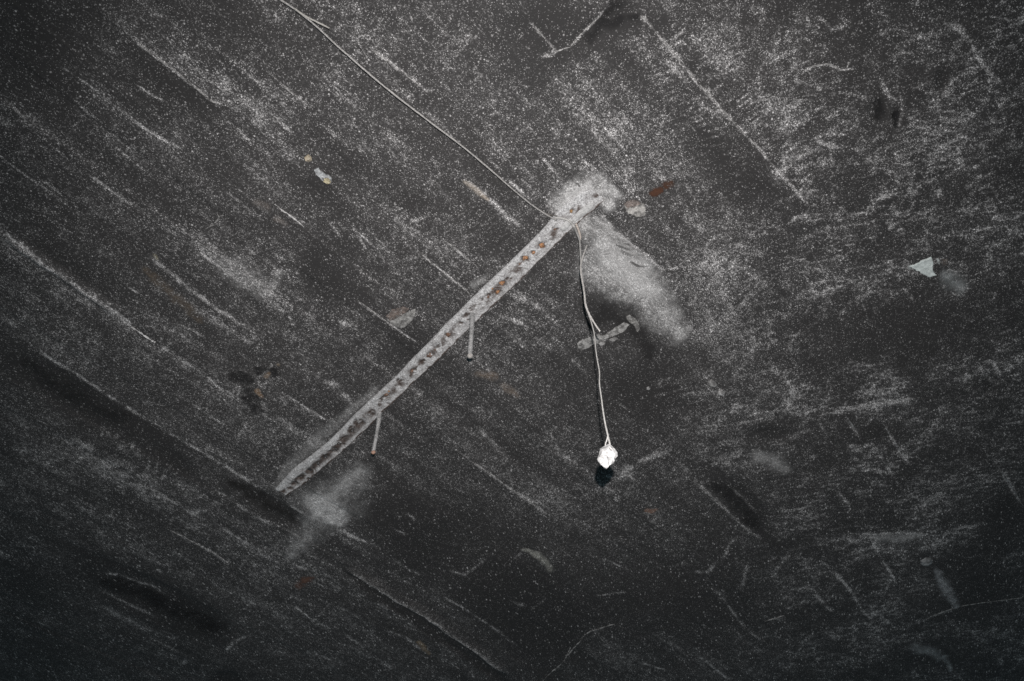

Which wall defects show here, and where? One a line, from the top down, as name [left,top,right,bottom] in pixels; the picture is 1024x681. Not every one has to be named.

leakage [553,174,687,358]
spalling [386,306,416,328]
peeling [577,314,640,350]
leakage [291,470,360,554]